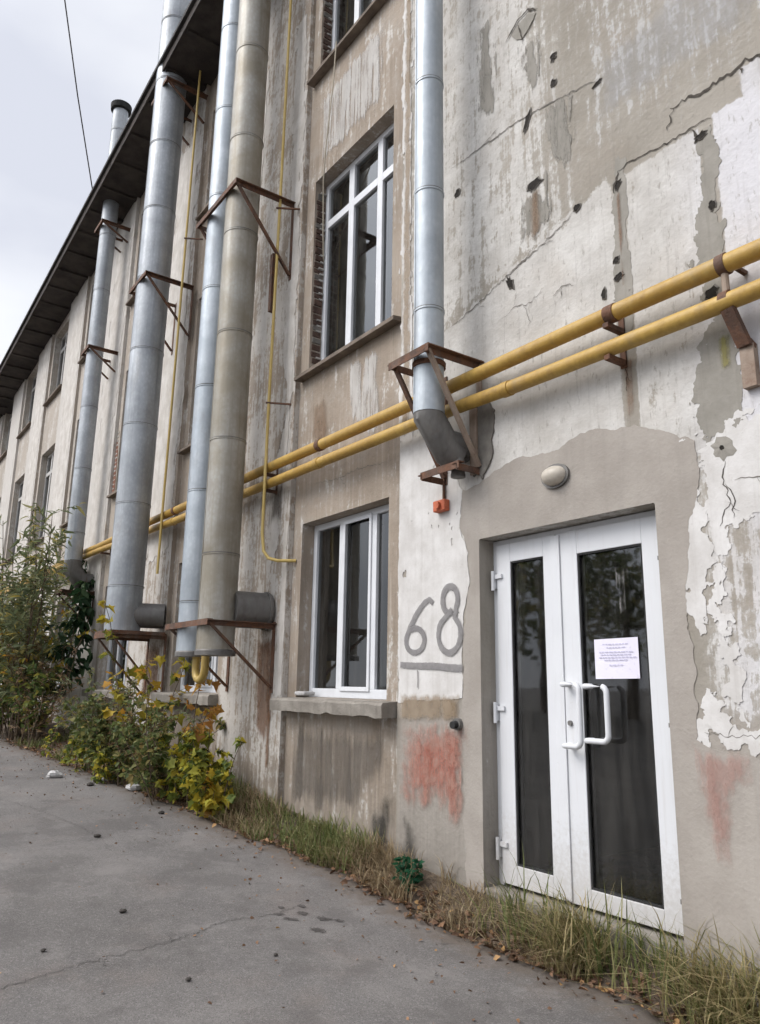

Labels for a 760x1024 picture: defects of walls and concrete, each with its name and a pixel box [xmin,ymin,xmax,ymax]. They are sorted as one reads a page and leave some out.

peeling [506,8,557,93]
crack [451,81,595,169]
crack [613,54,760,193]
peeling [686,124,727,268]
crack [450,214,572,328]
peeling [700,277,722,302]
peeling [679,314,760,757]
crack [721,460,760,524]